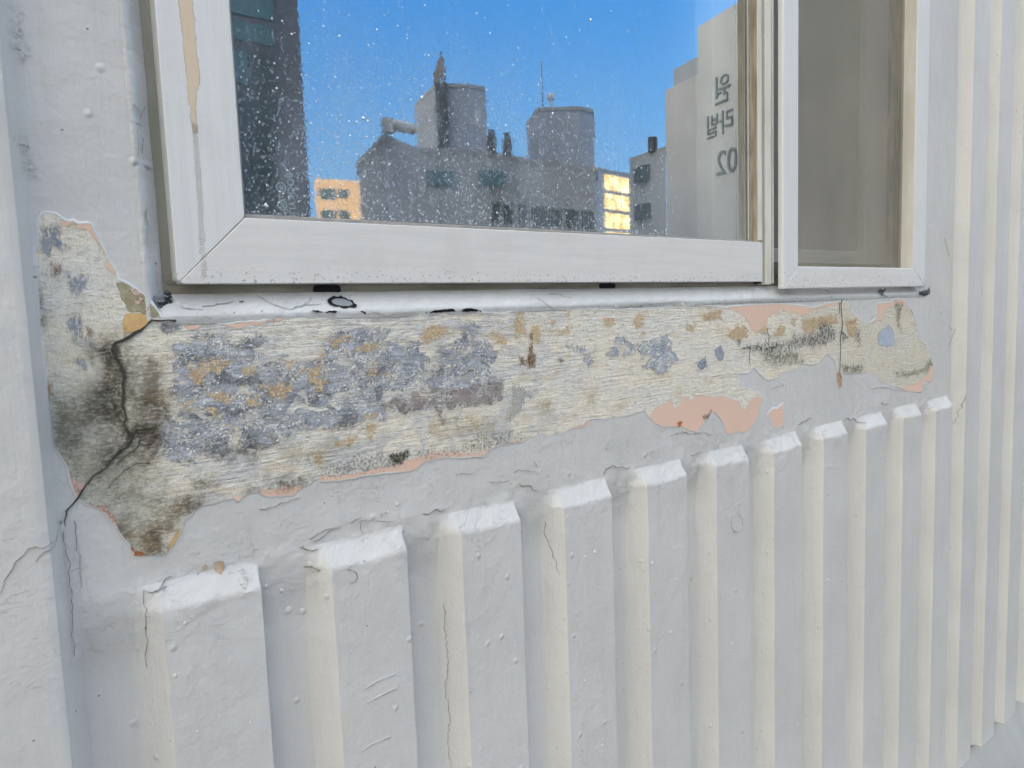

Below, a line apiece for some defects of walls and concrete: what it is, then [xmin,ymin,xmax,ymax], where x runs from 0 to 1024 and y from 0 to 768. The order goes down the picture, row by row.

crack [0,301,232,668]
water stain [54,345,201,555]
peeling [32,211,934,558]
crack [624,289,848,361]
water stain [747,324,860,364]